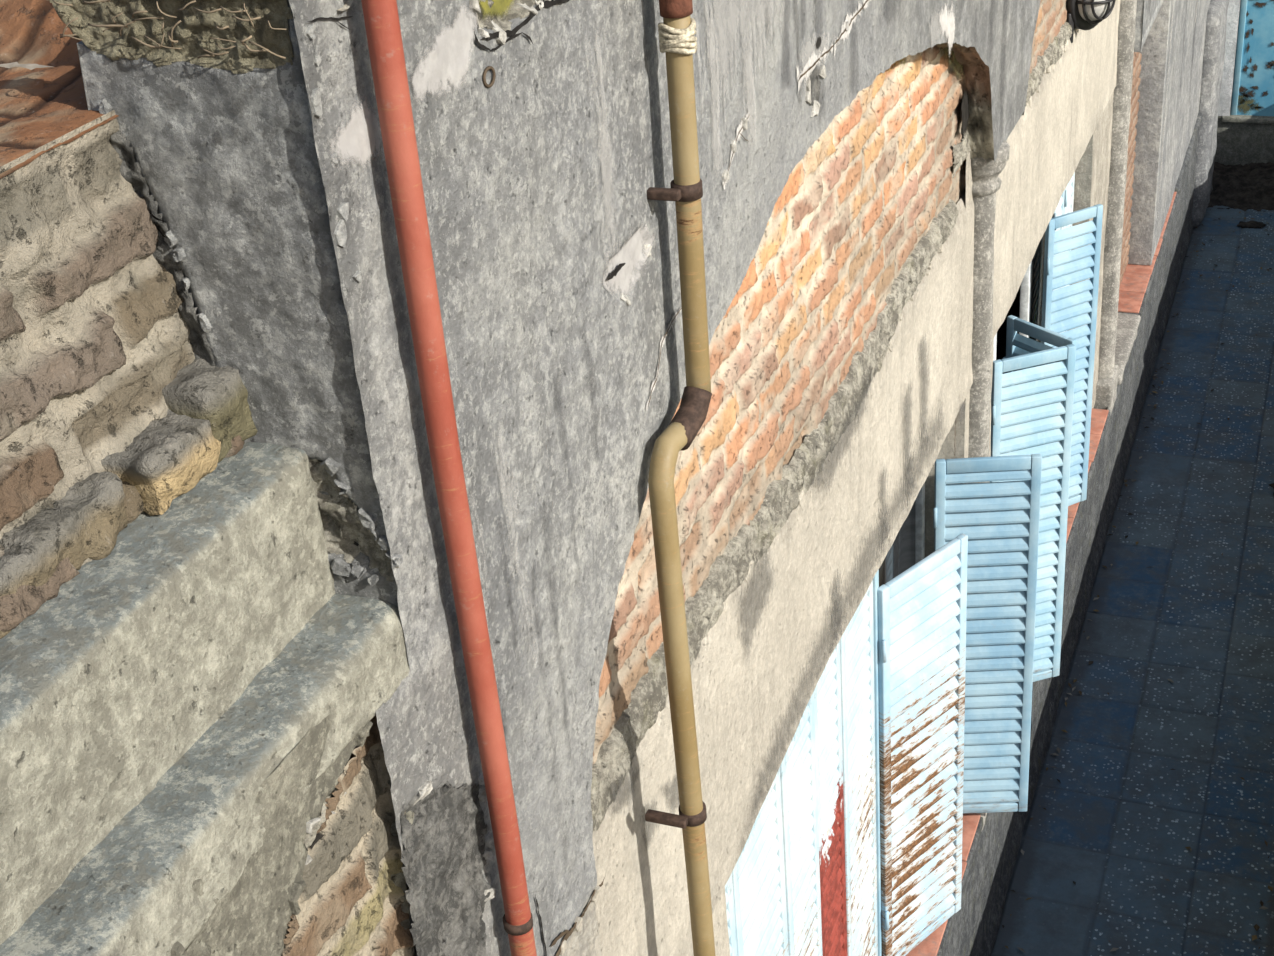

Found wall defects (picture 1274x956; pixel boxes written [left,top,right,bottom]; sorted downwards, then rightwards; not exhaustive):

flaking render [49,0,294,74]
spalling [308,88,323,117]
flaking render [469,0,569,45]
flaking render [805,65,826,117]
crack [796,0,871,92]
spalling [952,92,971,178]
peeling [1237,0,1274,113]
spalling [331,202,349,247]
flaking render [602,227,653,306]
flaking render [685,199,959,667]
flaking render [591,642,668,832]
flaking render [281,715,495,956]